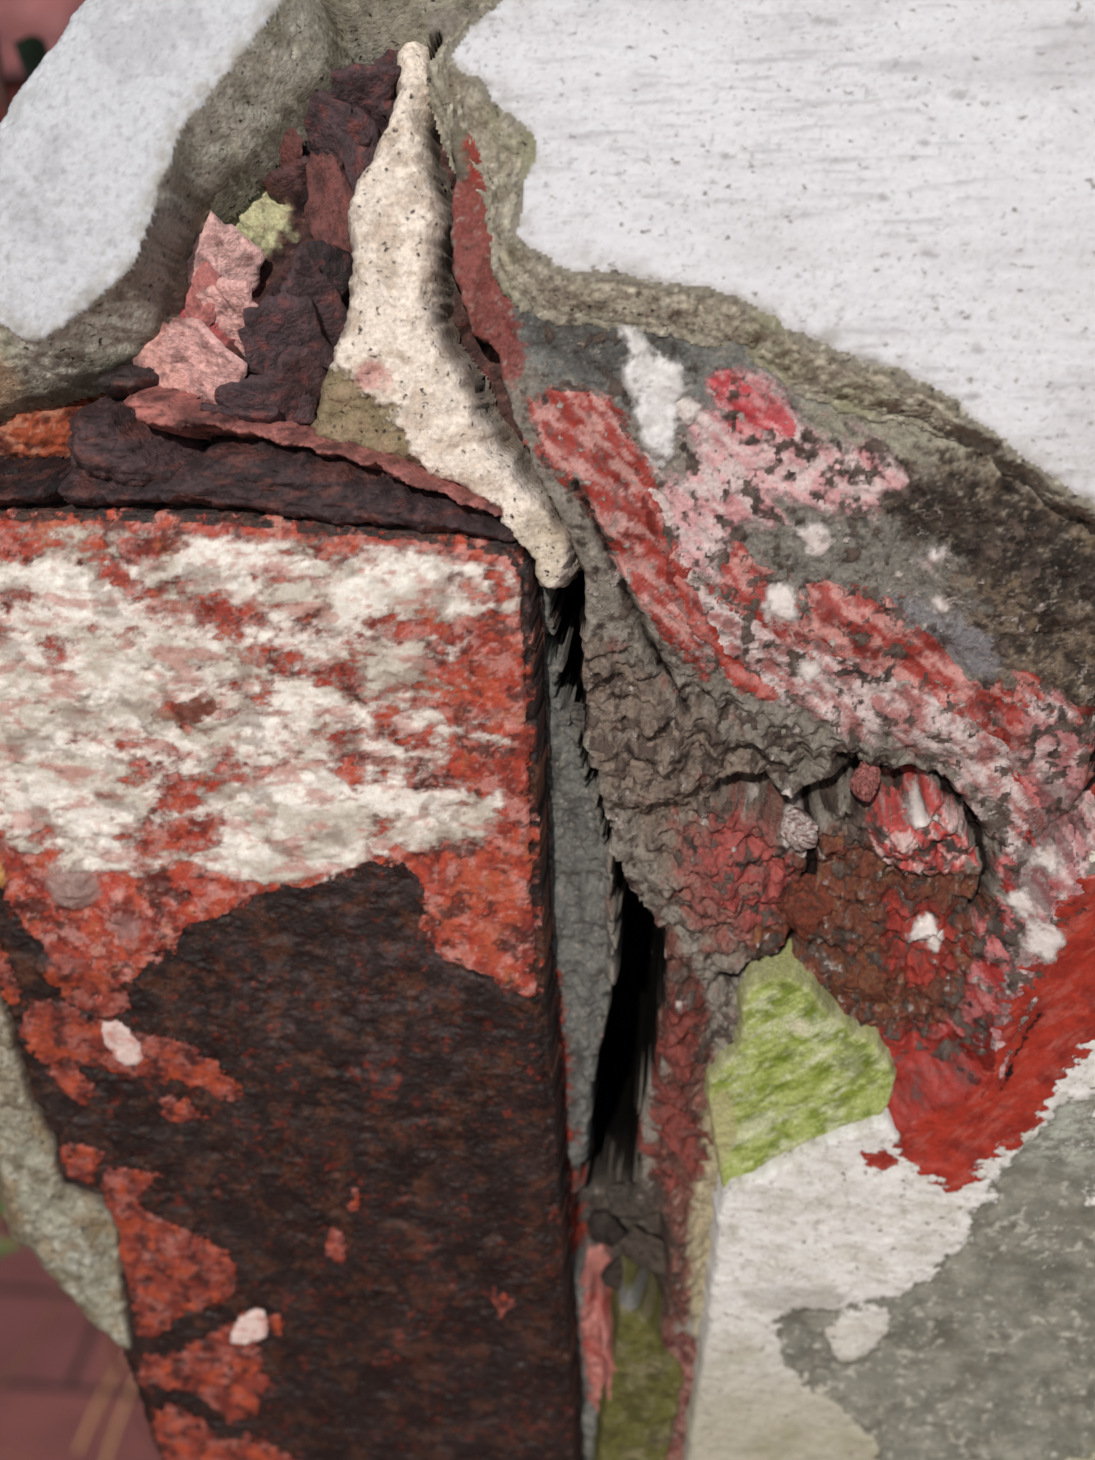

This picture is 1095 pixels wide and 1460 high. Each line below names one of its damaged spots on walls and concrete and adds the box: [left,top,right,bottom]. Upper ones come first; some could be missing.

crack [429,31,443,60]
spalling [209,322,257,379]
corrosion [0,49,518,543]
spalling [224,180,316,306]
crack [450,236,512,414]
spalling [320,0,1095,1460]
peeling [0,505,546,1350]
crack [551,480,687,1198]
peeling [136,1307,285,1424]
peeling [150,1403,294,1460]